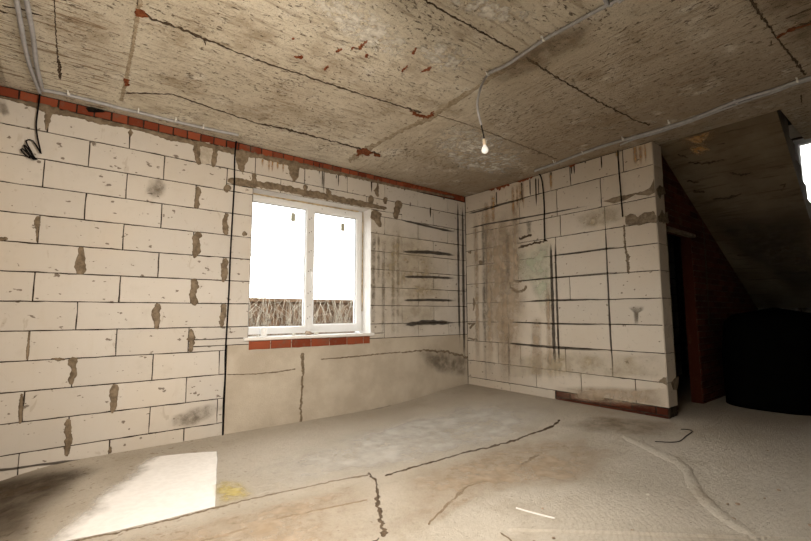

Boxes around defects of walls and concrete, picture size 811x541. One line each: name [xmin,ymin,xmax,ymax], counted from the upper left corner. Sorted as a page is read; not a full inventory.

crack [749,0,811,103]
crack [227,207,483,422]
crack [0,459,80,471]
crack [74,420,561,541]